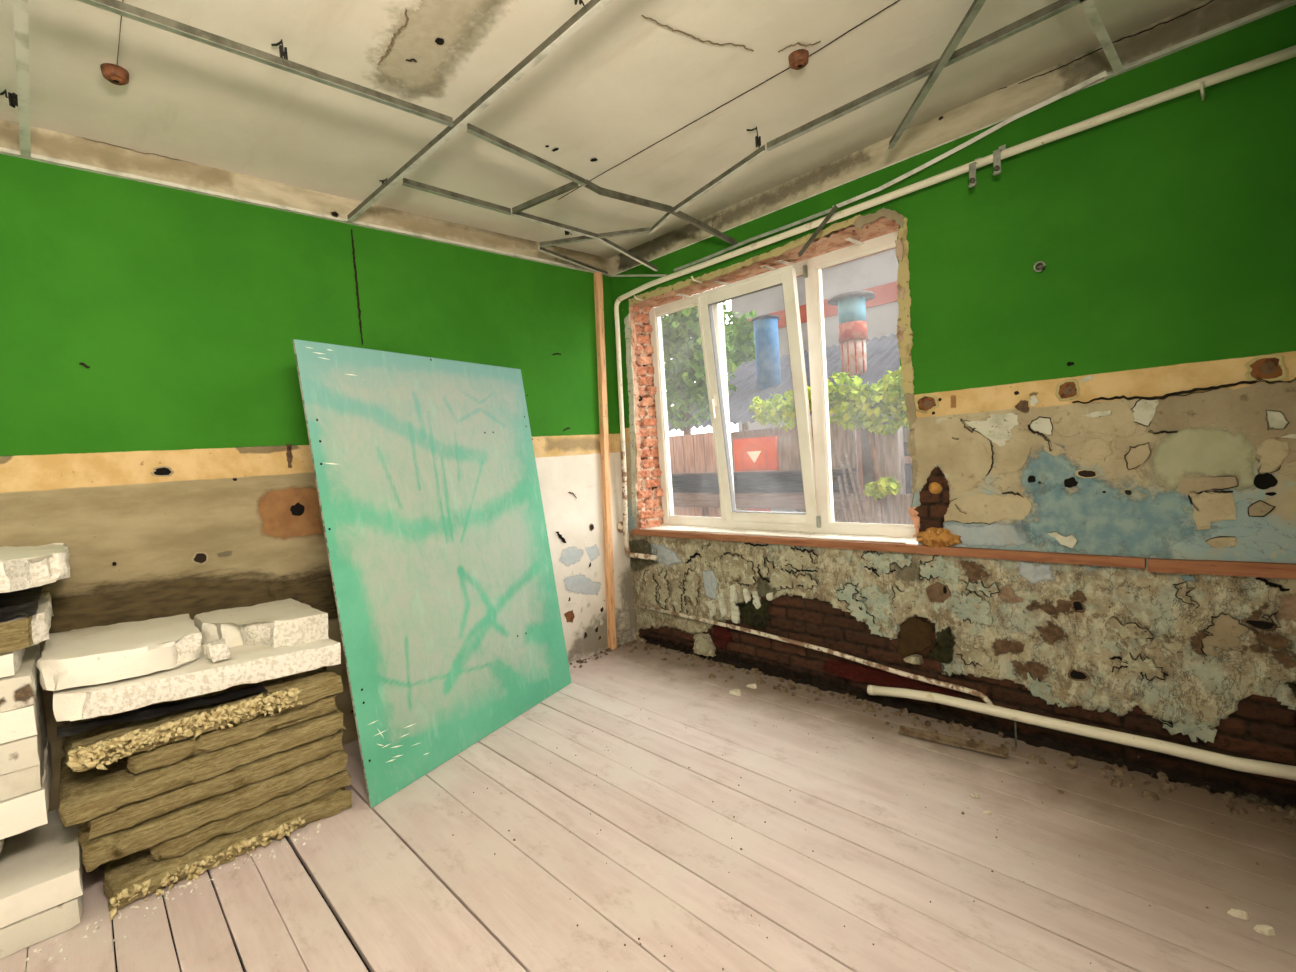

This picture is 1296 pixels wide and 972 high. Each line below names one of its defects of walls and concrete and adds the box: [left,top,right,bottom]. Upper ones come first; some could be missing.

leakage [377,0,494,94]
crack [558,0,900,200]
flaking render [620,208,1296,795]